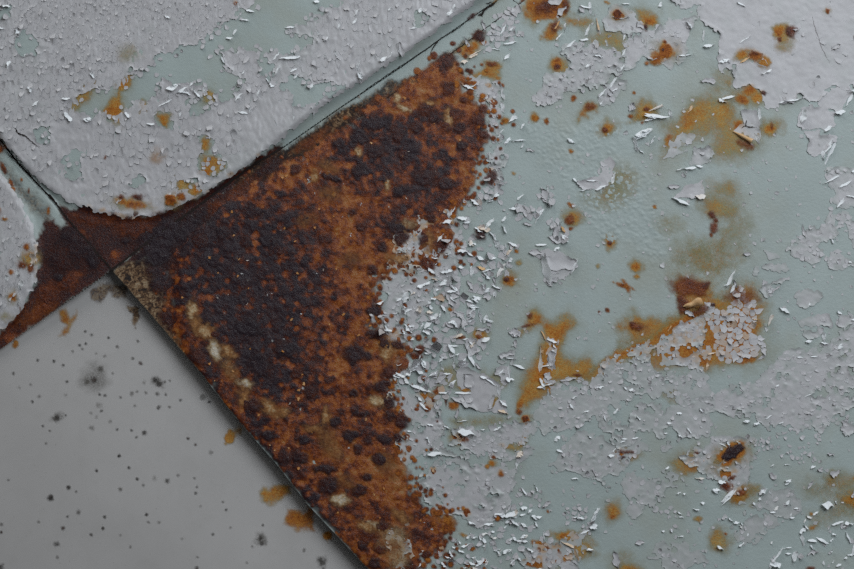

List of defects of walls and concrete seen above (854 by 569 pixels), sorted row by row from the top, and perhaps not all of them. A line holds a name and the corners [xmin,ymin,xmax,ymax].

peeling [62,0,363,122]
rust [521,0,590,40]
rust [645,40,676,65]
rust [736,50,772,67]
rust [772,24,796,50]
rust [628,91,656,124]
rust [664,84,766,156]
peeling [199,152,228,177]
rust [0,30,516,569]
peeling [369,0,854,569]
rust [516,183,764,425]
rust [713,441,759,503]